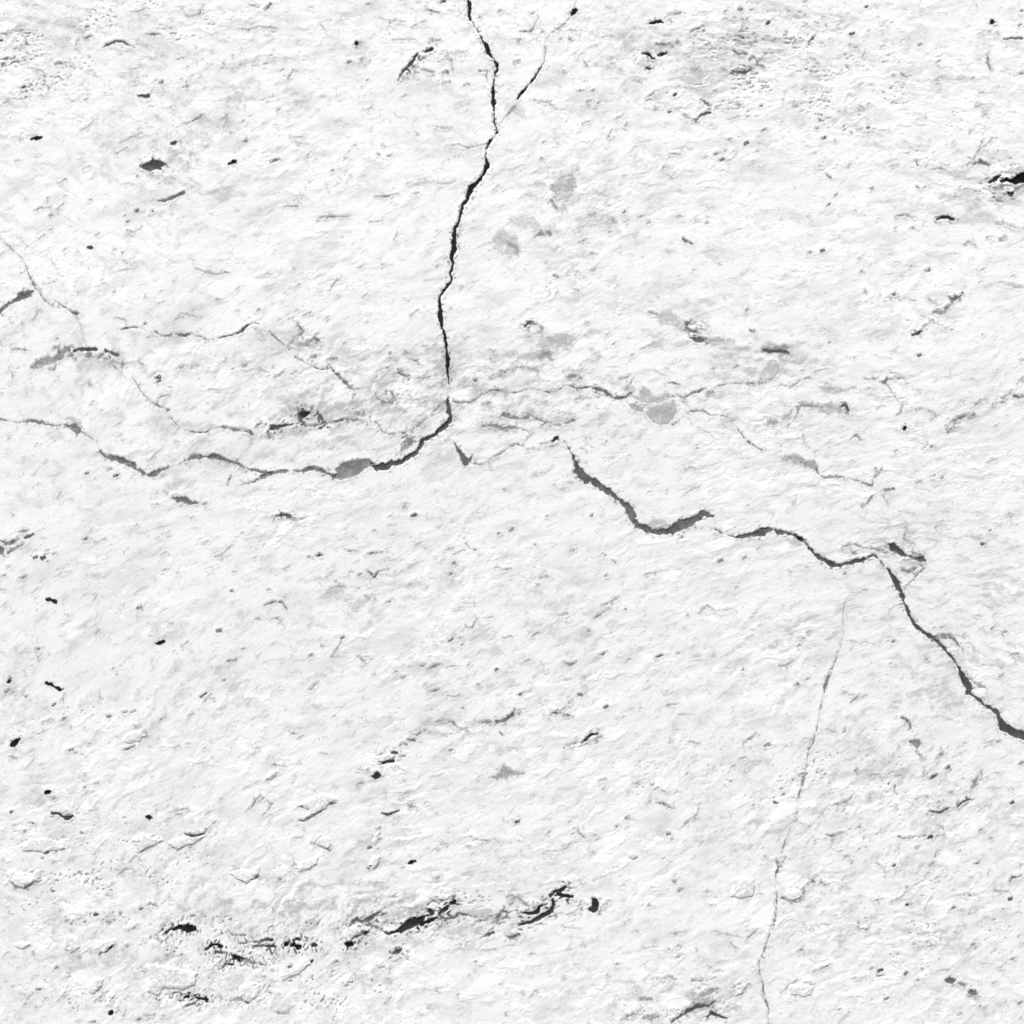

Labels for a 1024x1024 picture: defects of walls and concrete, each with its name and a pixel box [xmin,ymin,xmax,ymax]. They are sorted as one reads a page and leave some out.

crack [0,0,1024,740]
crack [380,708,519,764]
crack [758,636,891,1013]